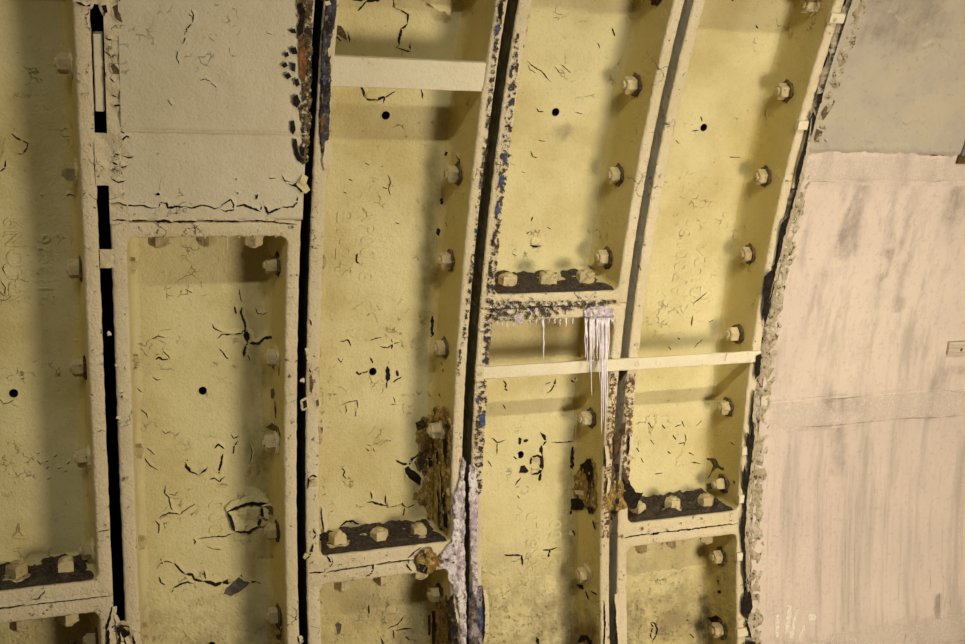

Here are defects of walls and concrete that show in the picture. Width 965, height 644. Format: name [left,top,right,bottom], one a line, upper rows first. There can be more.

crack [393,0,415,52]
rust [282,0,337,172]
crack [109,195,302,225]
crack [212,288,272,364]
leakage [491,300,617,325]
rust [413,392,453,535]
rust [570,422,643,531]
leakage [438,457,479,644]
rust [428,585,489,644]